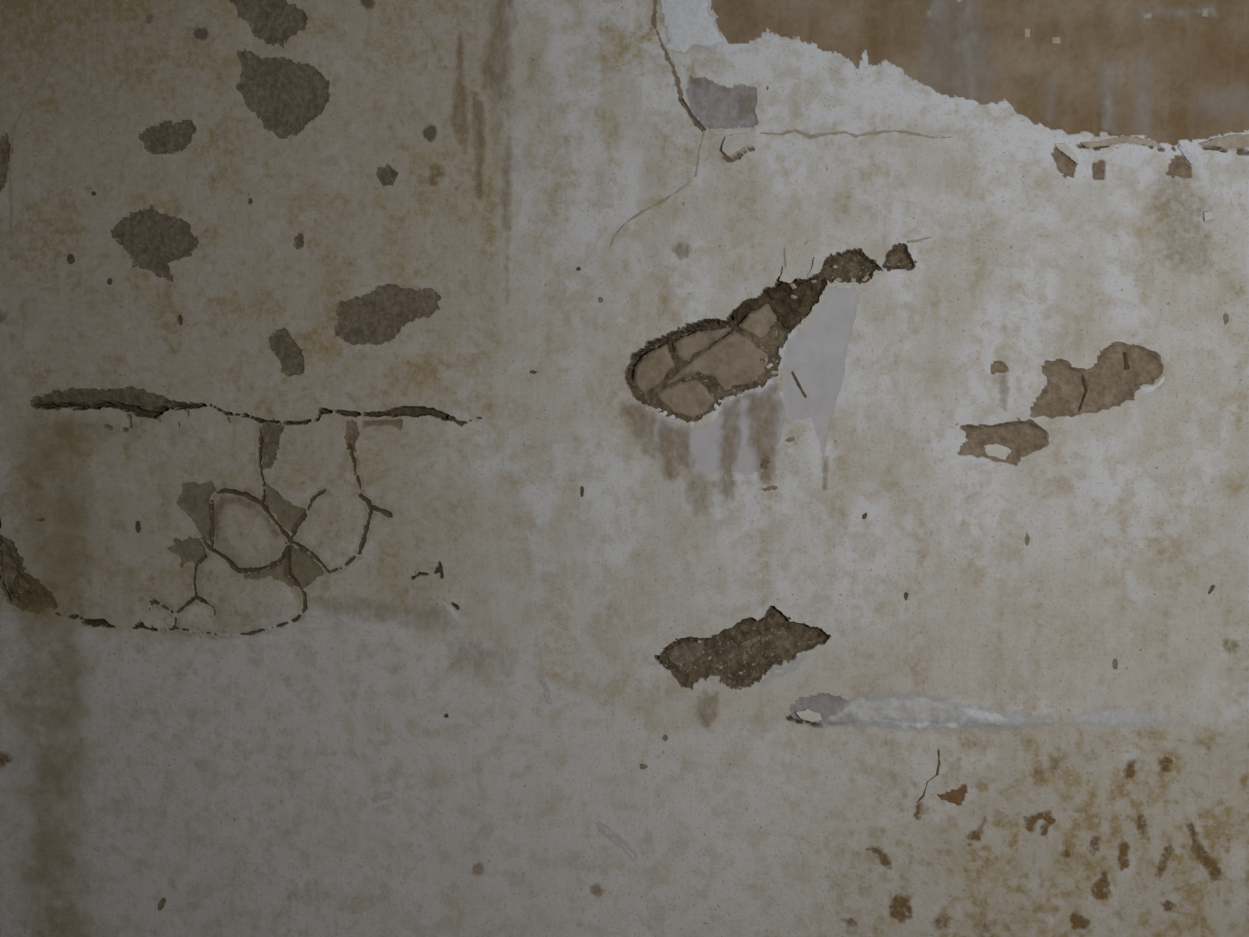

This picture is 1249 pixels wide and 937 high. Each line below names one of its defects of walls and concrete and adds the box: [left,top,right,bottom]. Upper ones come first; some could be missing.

crack [610,0,705,247]
crack [760,129,951,140]
peeling [661,0,1249,180]
spalling [625,236,931,476]
spalling [958,342,1164,466]
crack [30,386,482,635]
crack [0,521,12,603]
spalling [654,606,831,689]
rust [1026,813,1055,835]
rust [1118,843,1129,870]
rust [1187,823,1221,880]
rust [890,895,911,921]